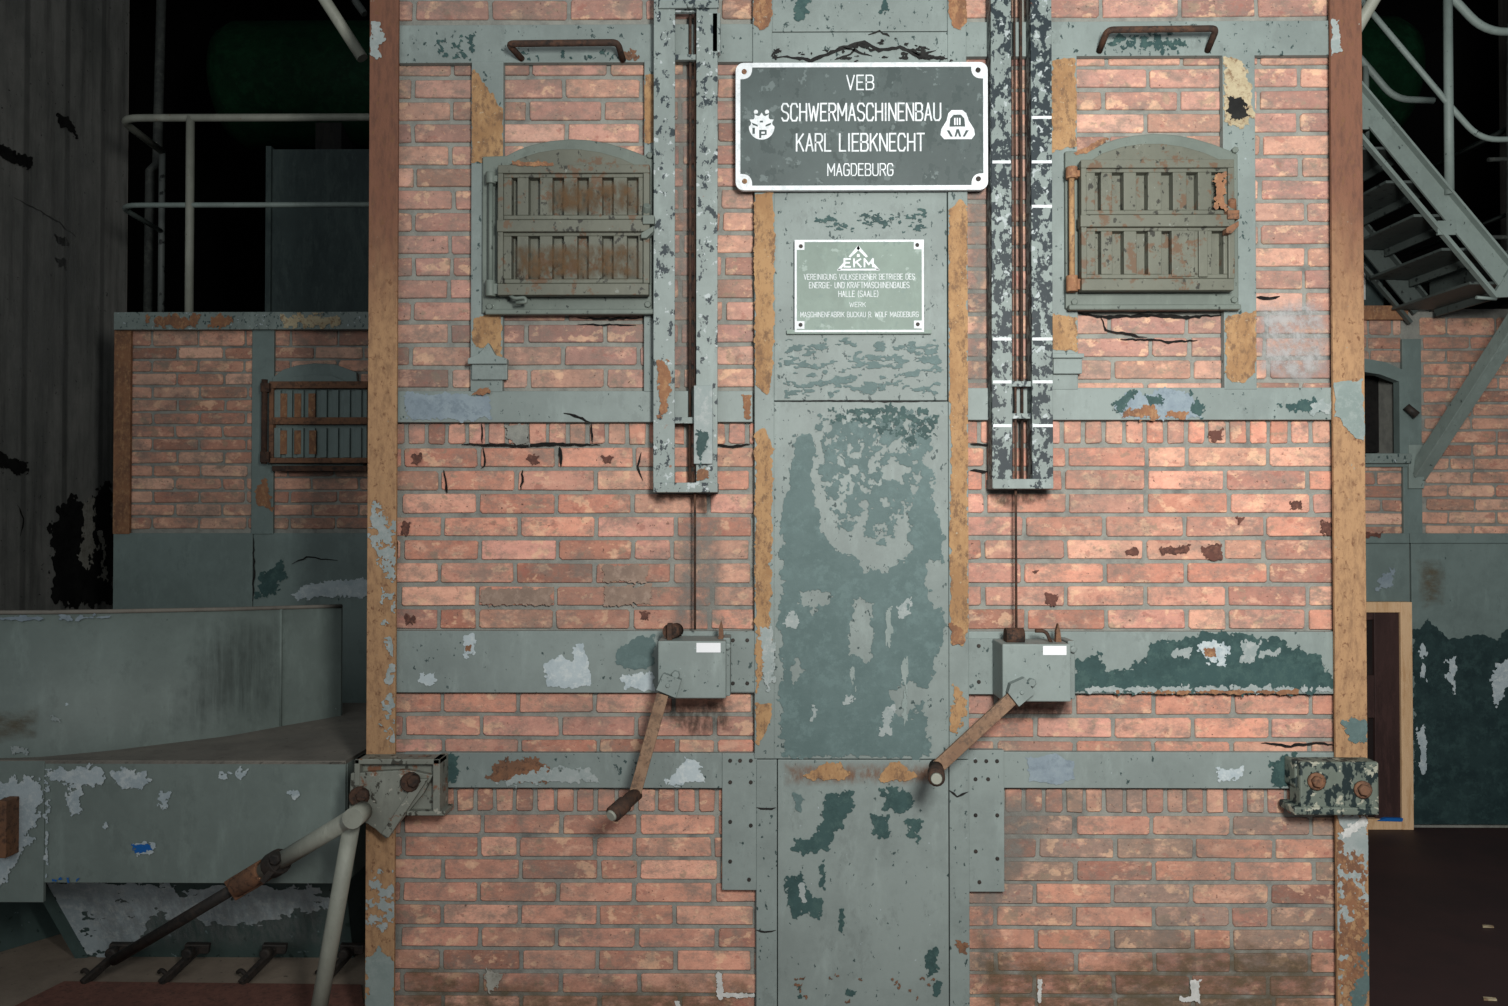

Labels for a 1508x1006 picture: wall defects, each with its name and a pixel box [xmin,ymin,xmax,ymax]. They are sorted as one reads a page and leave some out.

rust [1212,171,1229,212]
crack [1078,312,1221,344]
crack [1257,294,1280,302]
peeling [757,337,948,760]
peeling [1075,630,1334,698]
peeling [1412,619,1508,825]
peeling [0,763,330,957]
peeling [365,869,394,1006]
peeling [783,786,924,933]
peeling [924,947,943,997]
peeling [1337,815,1369,1006]